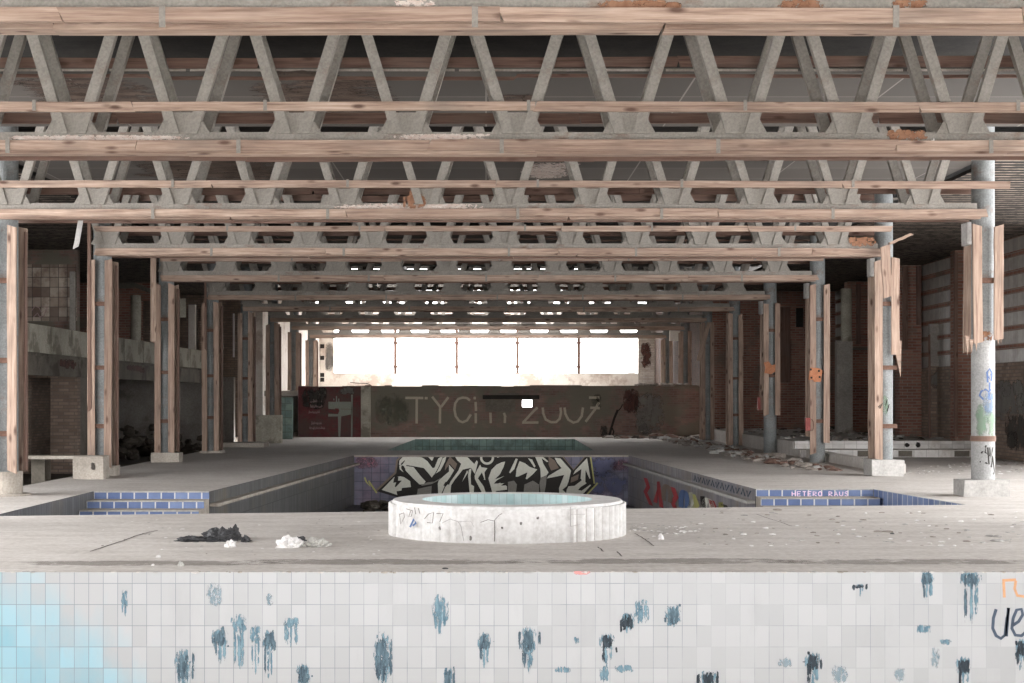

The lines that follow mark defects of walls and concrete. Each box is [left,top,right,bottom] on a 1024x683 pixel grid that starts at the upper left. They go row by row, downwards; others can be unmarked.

peeling [231,614,261,673]
peeling [432,594,449,634]